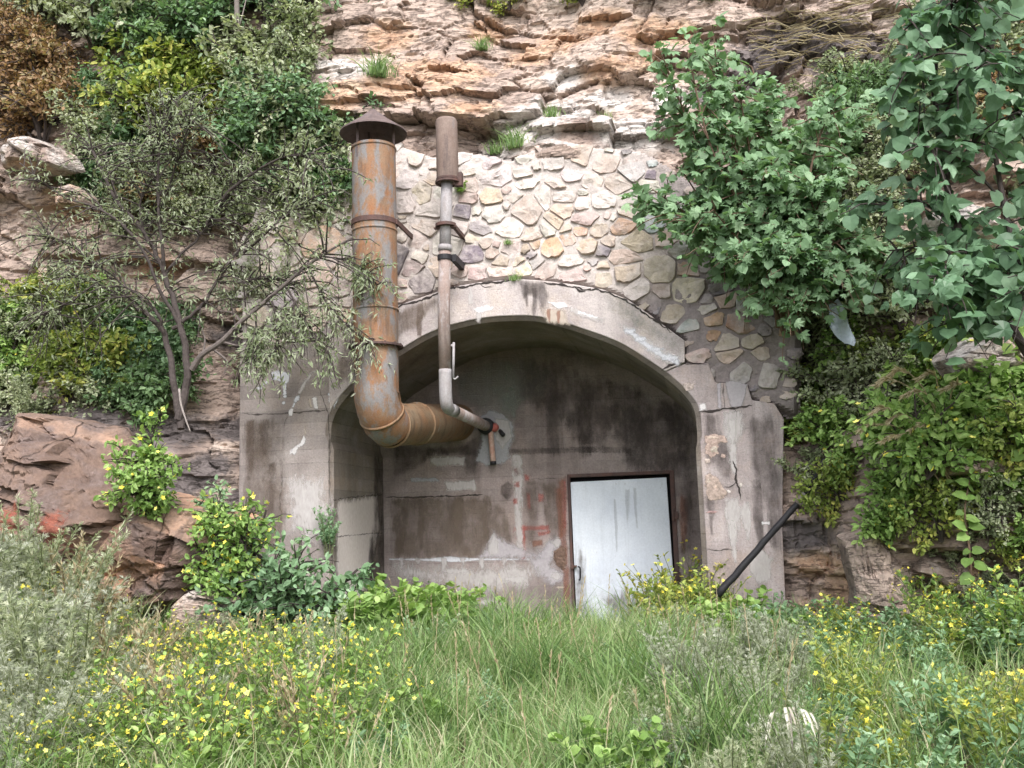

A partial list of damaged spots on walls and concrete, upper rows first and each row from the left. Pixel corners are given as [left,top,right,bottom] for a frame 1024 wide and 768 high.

peeling [476,410,514,465]
leakage [541,370,690,470]
spalling [704,434,742,514]
crack [730,462,744,498]